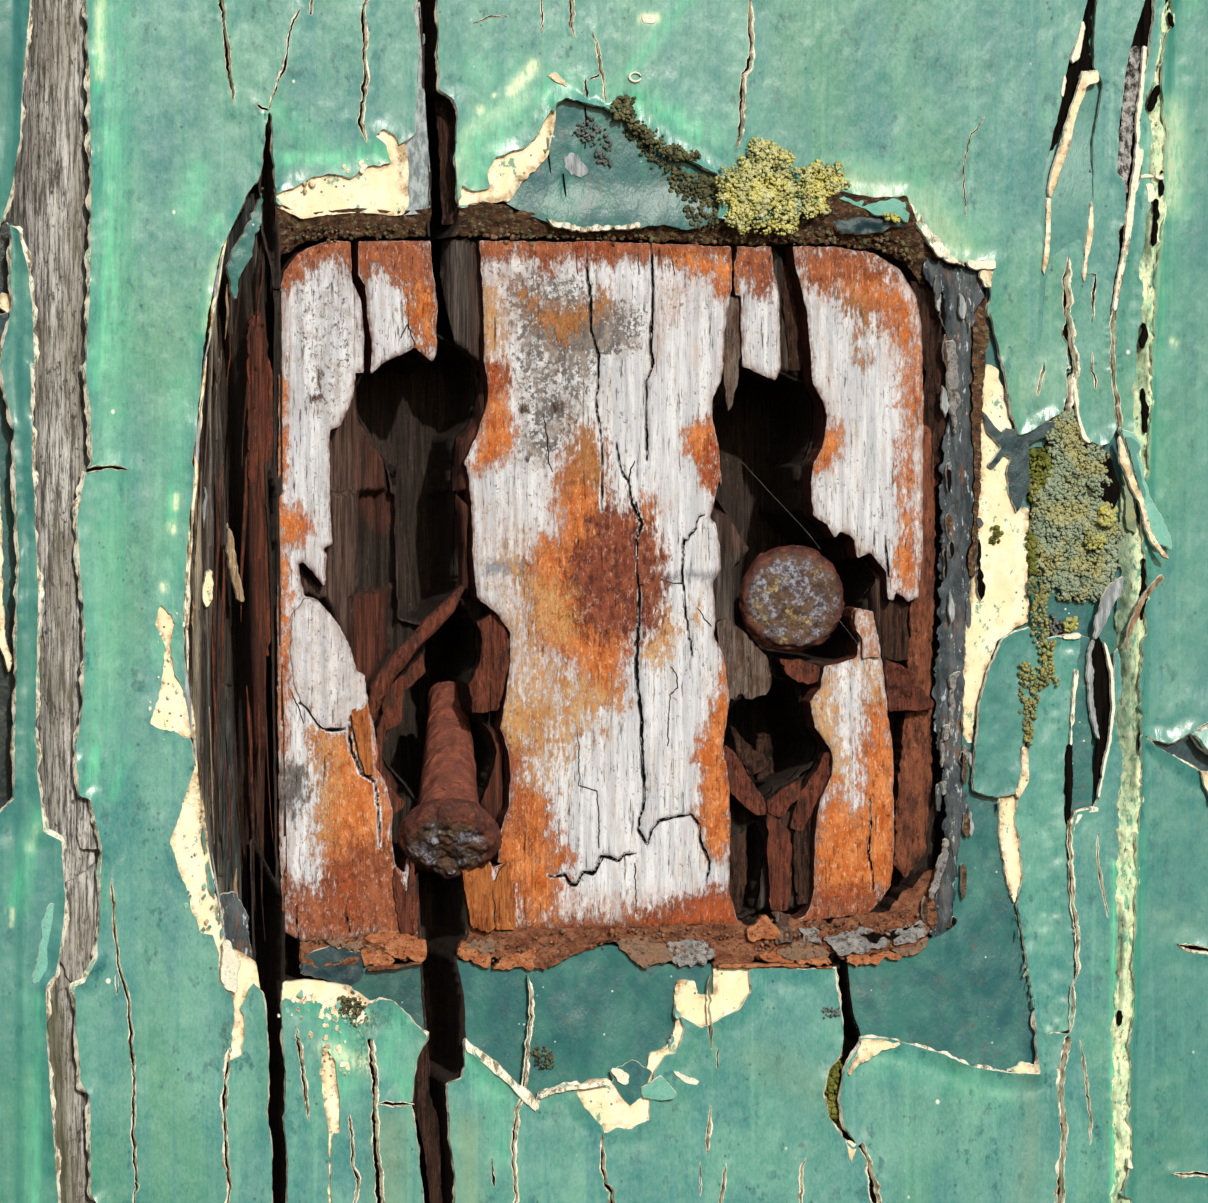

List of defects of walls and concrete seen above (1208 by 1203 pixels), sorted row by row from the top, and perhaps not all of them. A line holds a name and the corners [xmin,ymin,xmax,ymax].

corrosion [281,241,437,356]
crack [418,0,460,241]
peeling [457,72,719,233]
corrosion [469,241,779,479]
peeling [0,0,100,1203]
crack [218,0,381,1203]
corrosion [281,703,427,986]
peeling [455,945,750,1132]
crack [548,243,711,914]
corrosion [456,414,939,971]
peeling [847,259,1172,1076]
crack [1053,821,1108,1203]